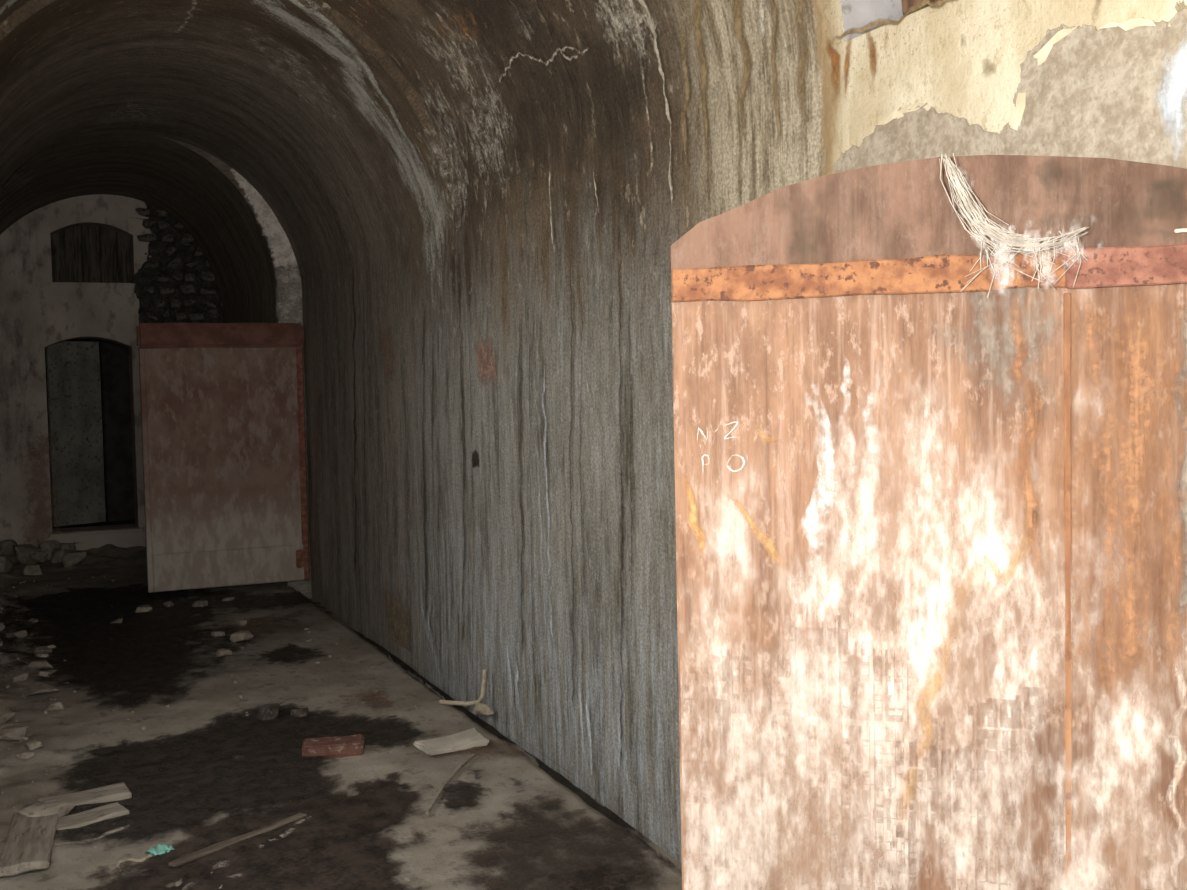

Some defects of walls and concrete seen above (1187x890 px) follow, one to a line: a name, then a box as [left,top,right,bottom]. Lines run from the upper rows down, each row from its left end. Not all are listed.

water stain [290,0,408,140]
water stain [499,47,626,247]
water stain [599,0,708,202]
water stain [733,0,751,123]
water stain [759,0,781,146]
water stain [796,0,807,121]
spalling [833,1,1187,172]
water stain [0,584,331,707]
water stain [52,703,484,890]
water stain [349,628,671,890]
peeling [1051,829,1098,890]
peeling [1085,656,1187,890]